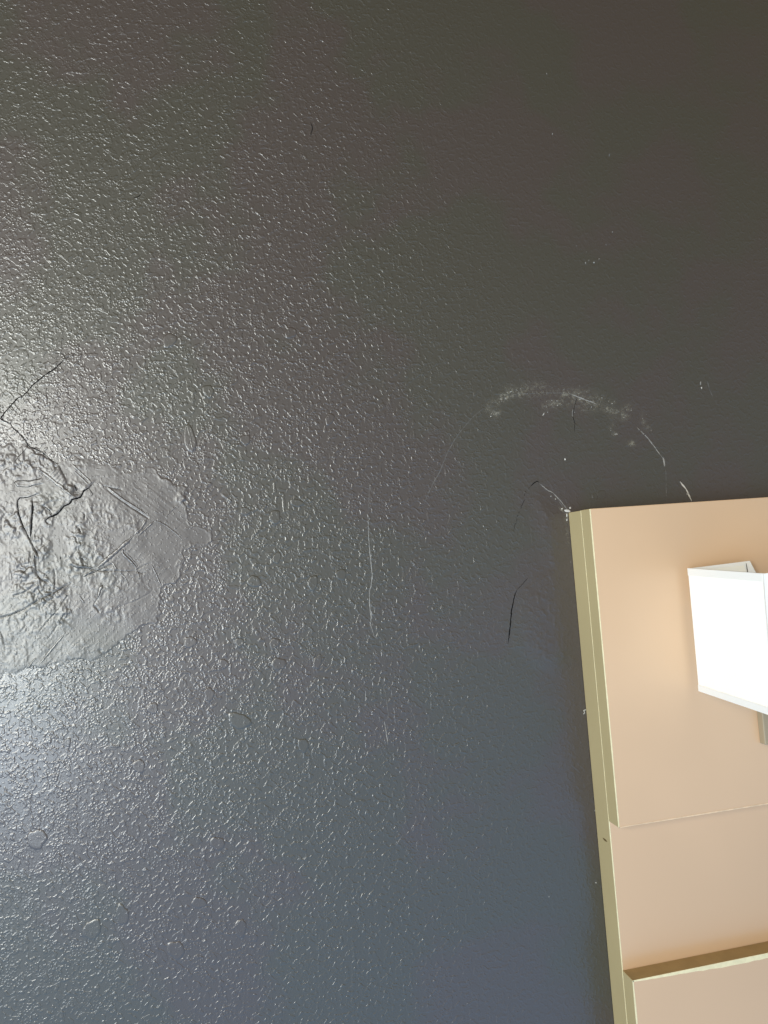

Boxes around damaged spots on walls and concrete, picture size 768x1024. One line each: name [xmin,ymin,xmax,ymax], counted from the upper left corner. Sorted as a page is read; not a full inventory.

crack [0,350,93,543]
crack [508,578,528,642]